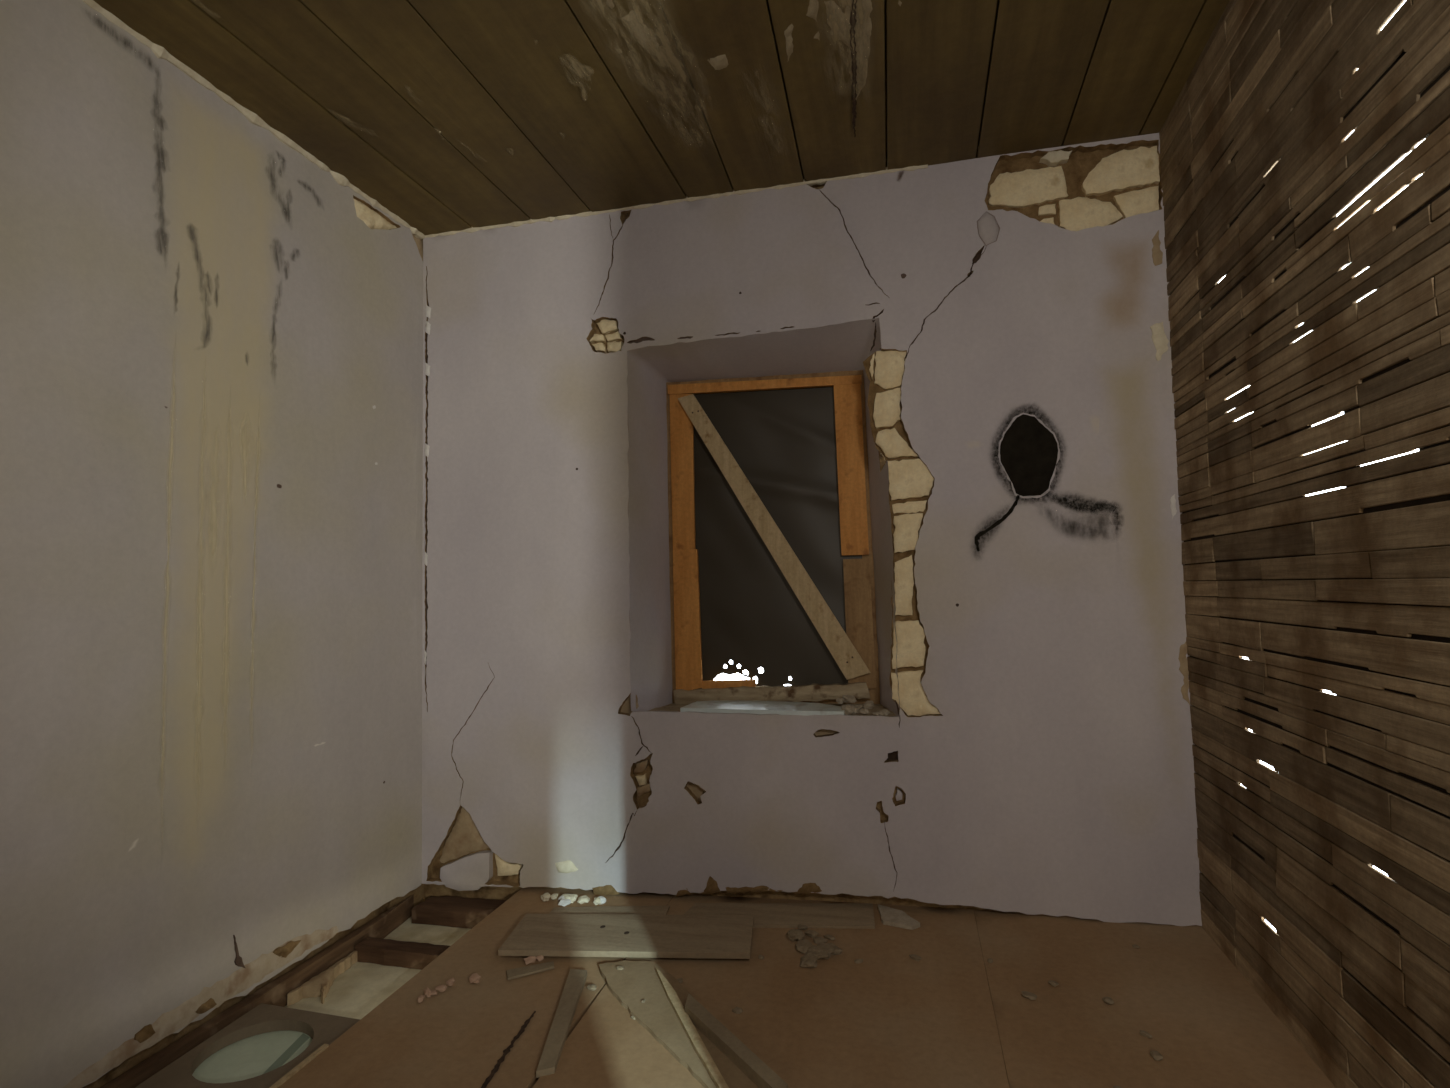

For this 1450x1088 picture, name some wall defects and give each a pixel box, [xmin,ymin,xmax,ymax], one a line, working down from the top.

peeling [590,0,728,143]
peeling [784,0,873,100]
flaking render [985,145,1160,231]
crack [815,187,986,361]
water stain [148,59,295,907]
flaking render [863,351,941,716]
spalling [431,807,523,891]
spalling [633,753,653,807]